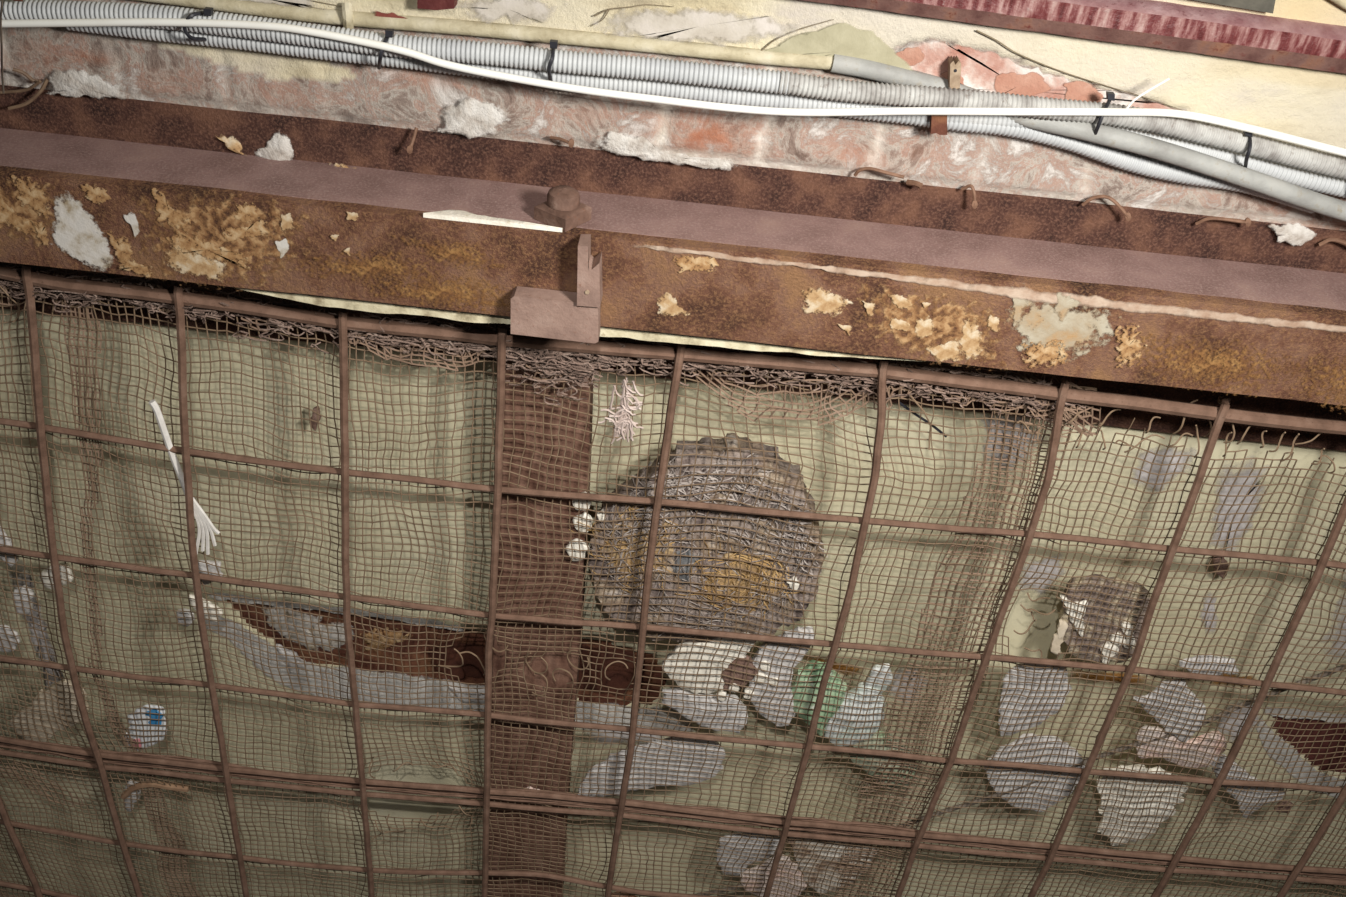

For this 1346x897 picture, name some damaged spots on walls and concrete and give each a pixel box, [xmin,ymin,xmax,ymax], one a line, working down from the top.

flaking render [613,9,1175,110]
peeling [0,175,310,290]
rust [300,235,510,313]
peeling [647,245,1346,371]
rust [1133,333,1346,411]
peeling [1212,469,1265,551]
flaking render [205,593,486,712]
flaking render [575,638,692,743]